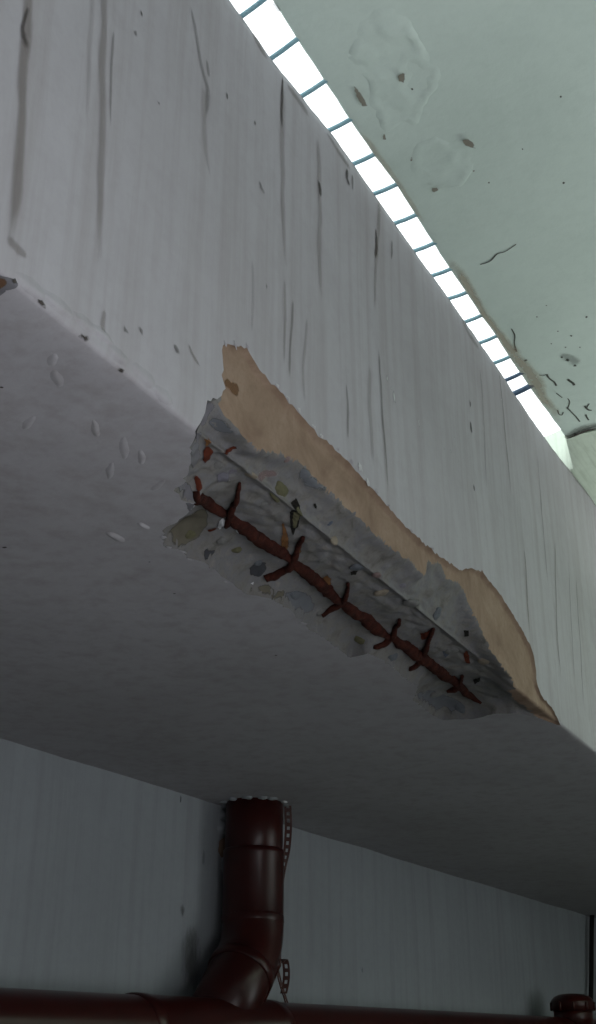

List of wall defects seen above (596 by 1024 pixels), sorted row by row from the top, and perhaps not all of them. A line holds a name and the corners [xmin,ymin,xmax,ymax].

spalling [159,340,561,726]
crack [540,374,596,439]